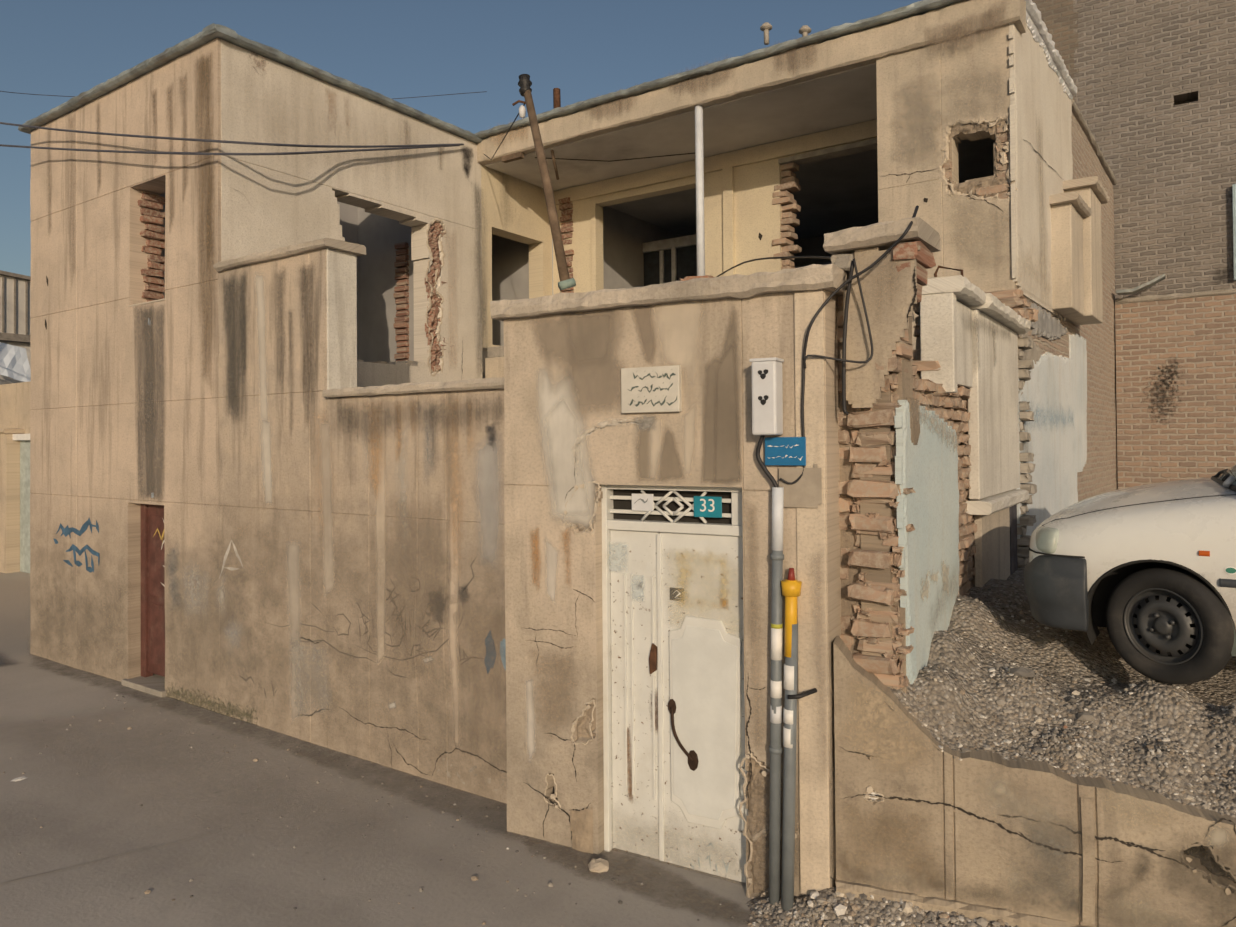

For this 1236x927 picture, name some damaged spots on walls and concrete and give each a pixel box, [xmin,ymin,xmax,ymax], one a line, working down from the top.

spalling [936,113,1018,204]
flaking render [138,192,165,302]
leakage [170,60,272,503]
spalling [425,218,452,377]
leakage [137,307,164,498]
crack [526,589,594,667]
crack [296,707,589,848]
crack [839,746,899,760]
crack [841,794,1187,867]
hole [1179,842,1236,895]
crack [1205,818,1236,837]